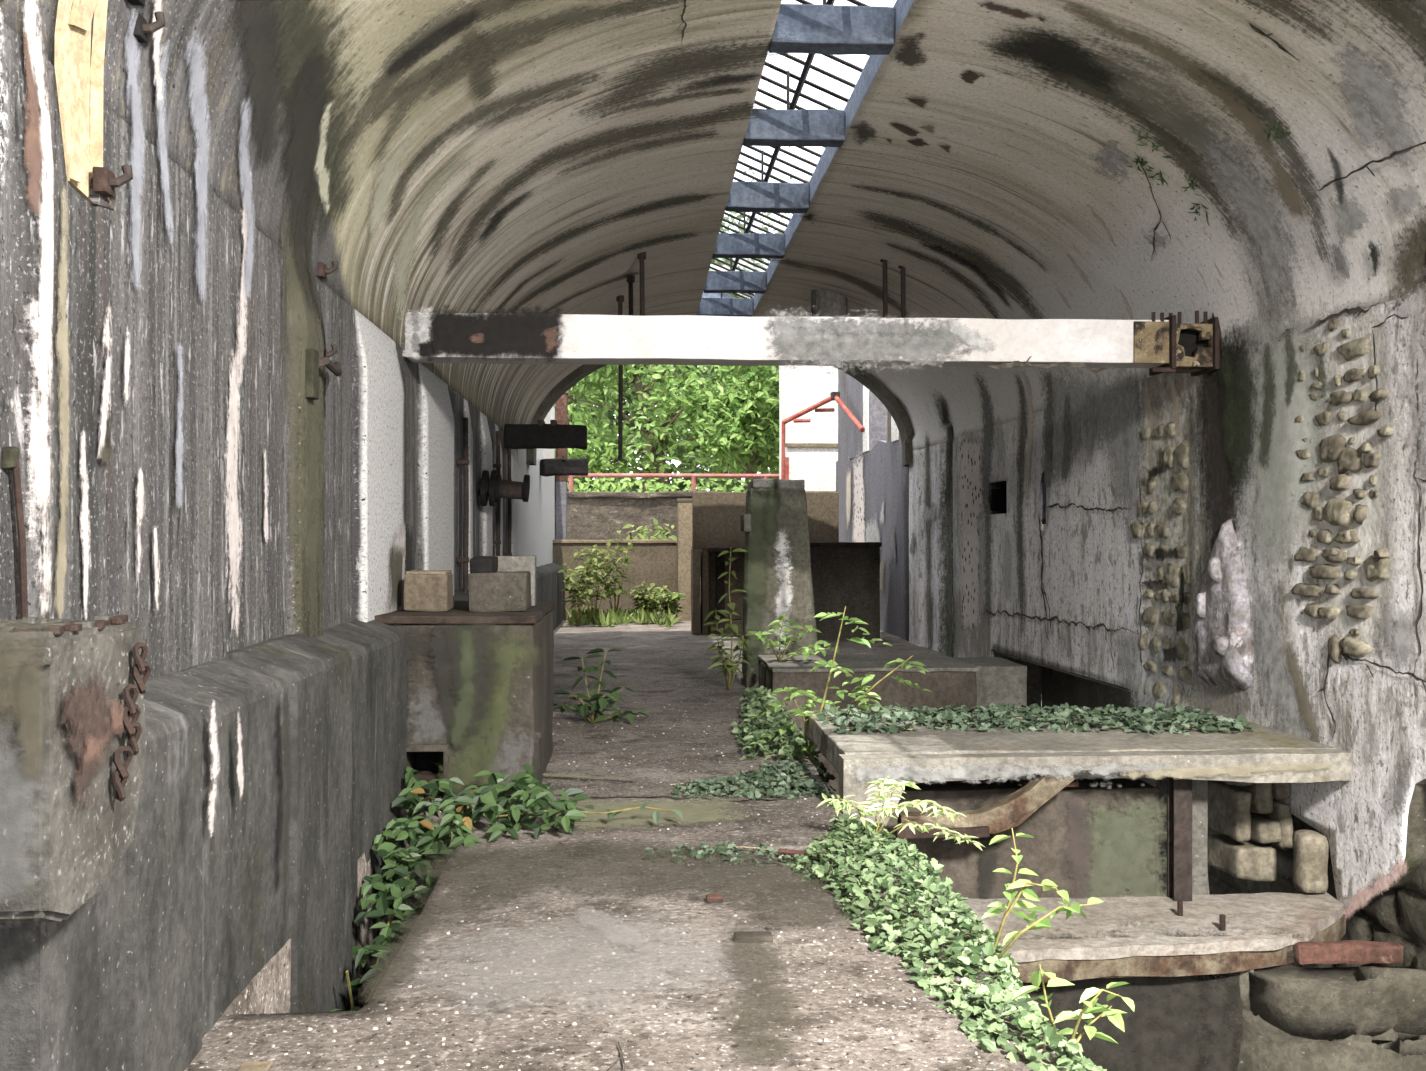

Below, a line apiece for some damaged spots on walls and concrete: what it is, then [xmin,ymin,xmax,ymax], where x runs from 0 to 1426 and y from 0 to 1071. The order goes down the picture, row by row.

corrosion [24,33,42,212]
spalling [55,0,115,209]
water stain [125,0,174,288]
water stain [188,37,211,300]
water stain [224,0,546,630]
water stain [981,23,1344,547]
spalling [1131,388,1203,708]
crack [1277,303,1426,739]
spalling [1291,182,1426,671]
crack [1316,141,1426,191]
corrosion [62,669,132,805]
peeling [1391,757,1407,817]